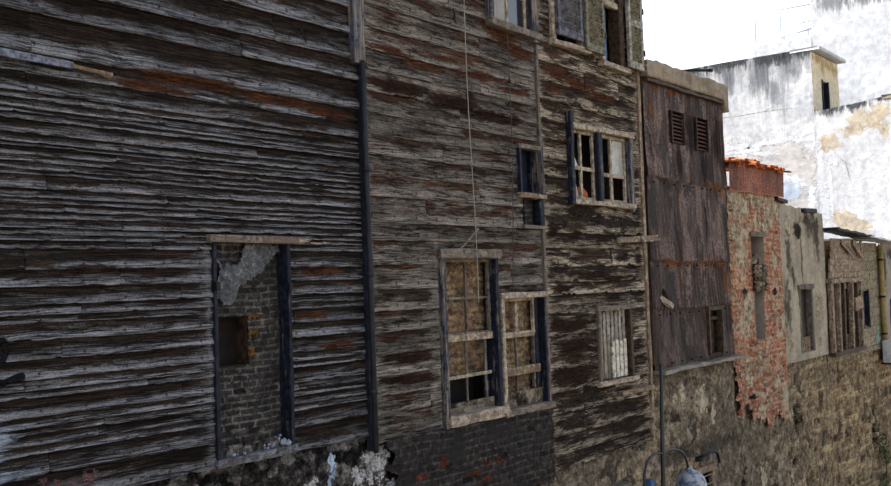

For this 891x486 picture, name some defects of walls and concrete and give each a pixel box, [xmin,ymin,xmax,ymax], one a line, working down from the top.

damp [691,50,810,75]
flaking render [724,102,891,257]
flaking render [217,244,279,305]
peeling [741,350,768,416]
peeling [351,446,400,486]